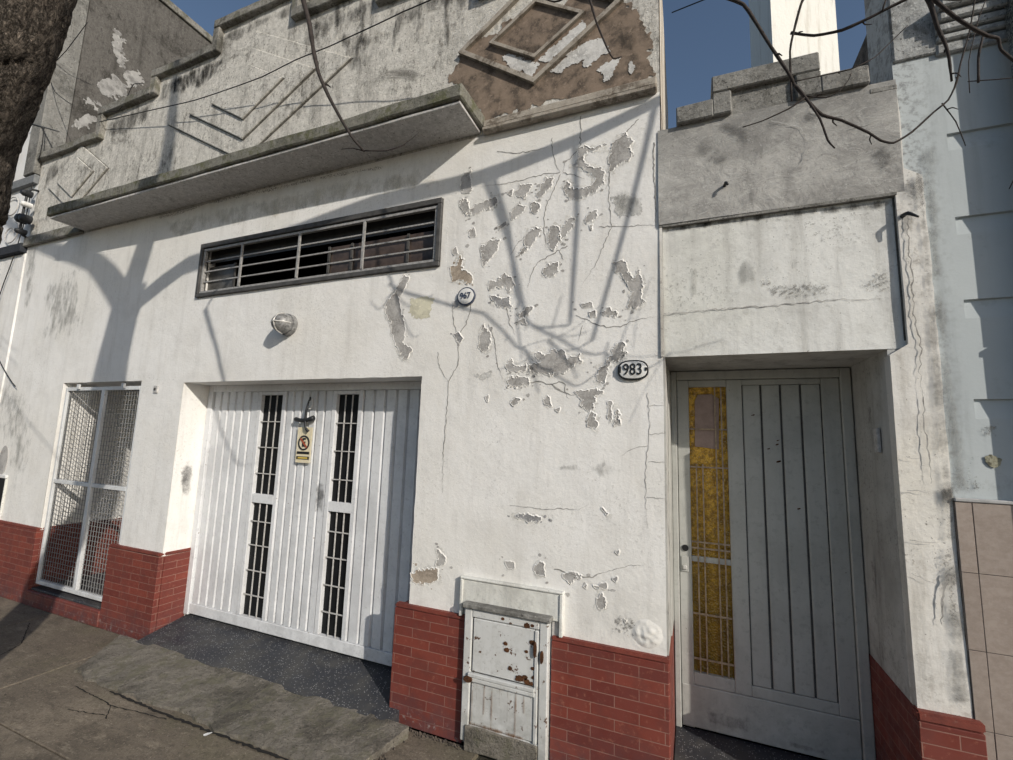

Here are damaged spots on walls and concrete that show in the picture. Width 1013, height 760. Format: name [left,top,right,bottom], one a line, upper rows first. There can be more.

peeling [71,28,145,129]
peeling [448,0,656,120]
crack [495,116,584,283]
peeling [447,132,647,326]
crack [585,119,656,280]
peeling [383,271,435,363]
crack [437,299,514,490]
peeling [474,323,629,434]
crack [527,381,578,398]
crack [627,393,665,525]
peeling [410,543,453,590]
rust [508,666,534,686]